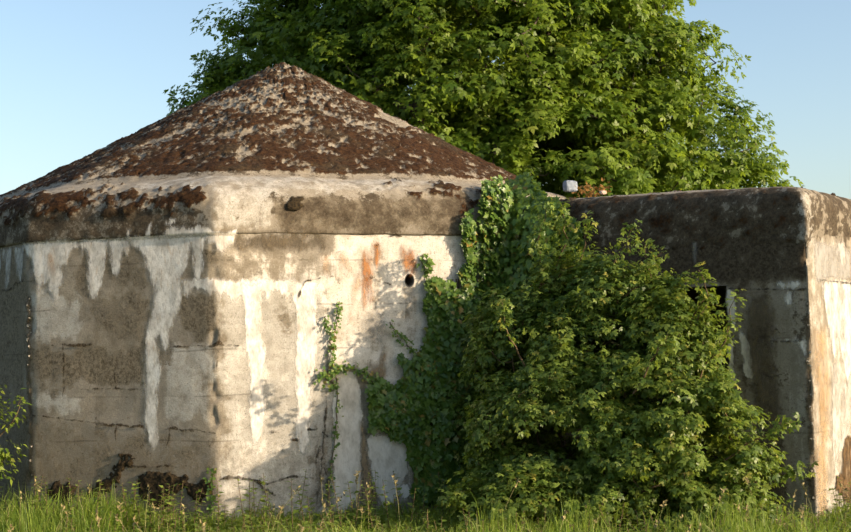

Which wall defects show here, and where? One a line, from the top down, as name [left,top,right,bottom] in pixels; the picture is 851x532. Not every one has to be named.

corrosion [363,244,379,303]
corrosion [403,249,415,270]
damp [0,219,325,453]
peeling [836,436,851,503]